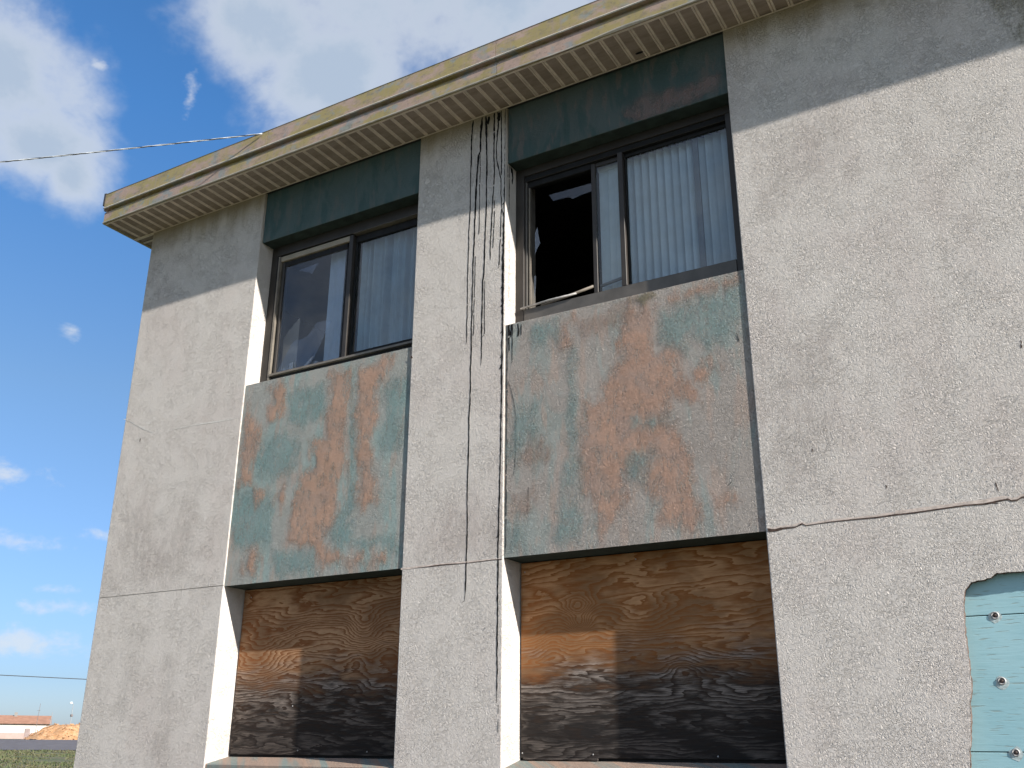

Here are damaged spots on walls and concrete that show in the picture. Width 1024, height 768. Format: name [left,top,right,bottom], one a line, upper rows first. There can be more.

water stain [463,109,522,713]
crack [768,483,1024,532]
flaking render [963,571,1024,768]